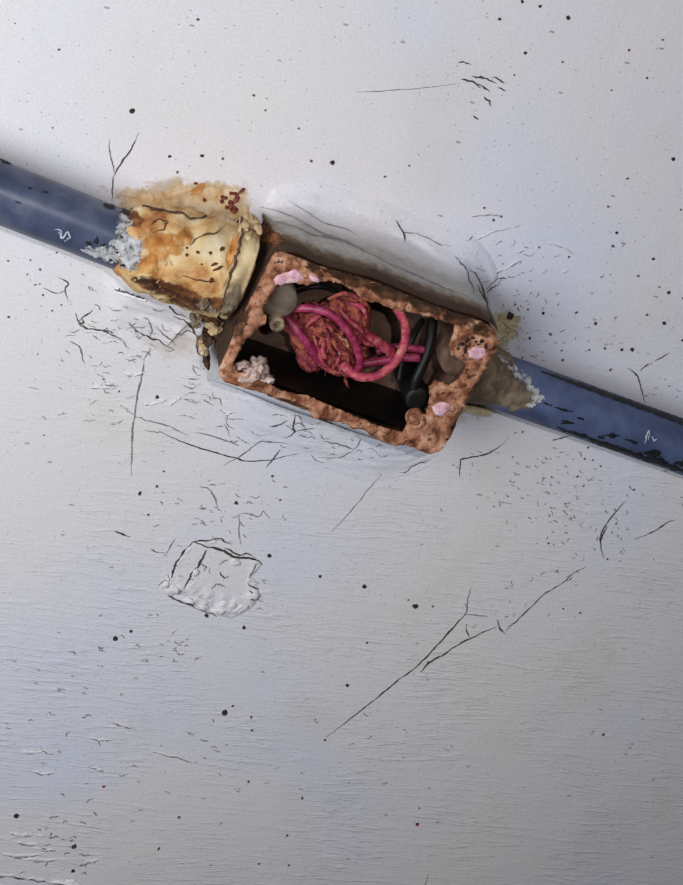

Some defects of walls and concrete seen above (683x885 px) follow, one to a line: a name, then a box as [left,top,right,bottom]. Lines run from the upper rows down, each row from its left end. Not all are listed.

crack [364,83,459,92]
crack [109,137,137,198]
corrosion [122,178,249,221]
corrosion [260,226,284,246]
crack [44,277,360,467]
crack [599,502,625,558]
crack [326,569,581,737]